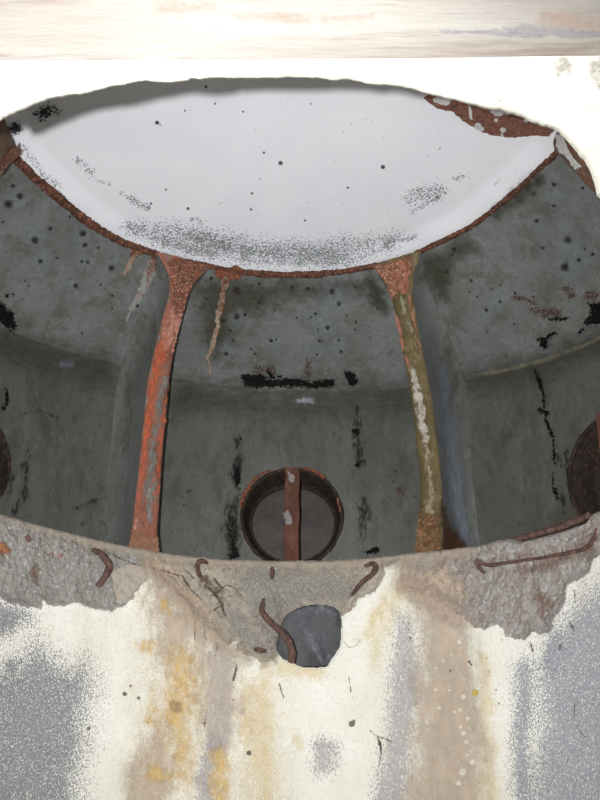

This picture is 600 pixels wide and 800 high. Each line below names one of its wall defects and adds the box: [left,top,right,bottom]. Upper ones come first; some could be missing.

peeling [555,134,582,170]
peeling [400,183,448,213]
corrosion [0,143,161,322]
peeling [113,207,417,272]
corrosion [167,150,561,375]
corrosion [130,530,160,552]
corrosion [414,507,465,552]
damp [0,368,494,800]
spalling [0,511,600,664]